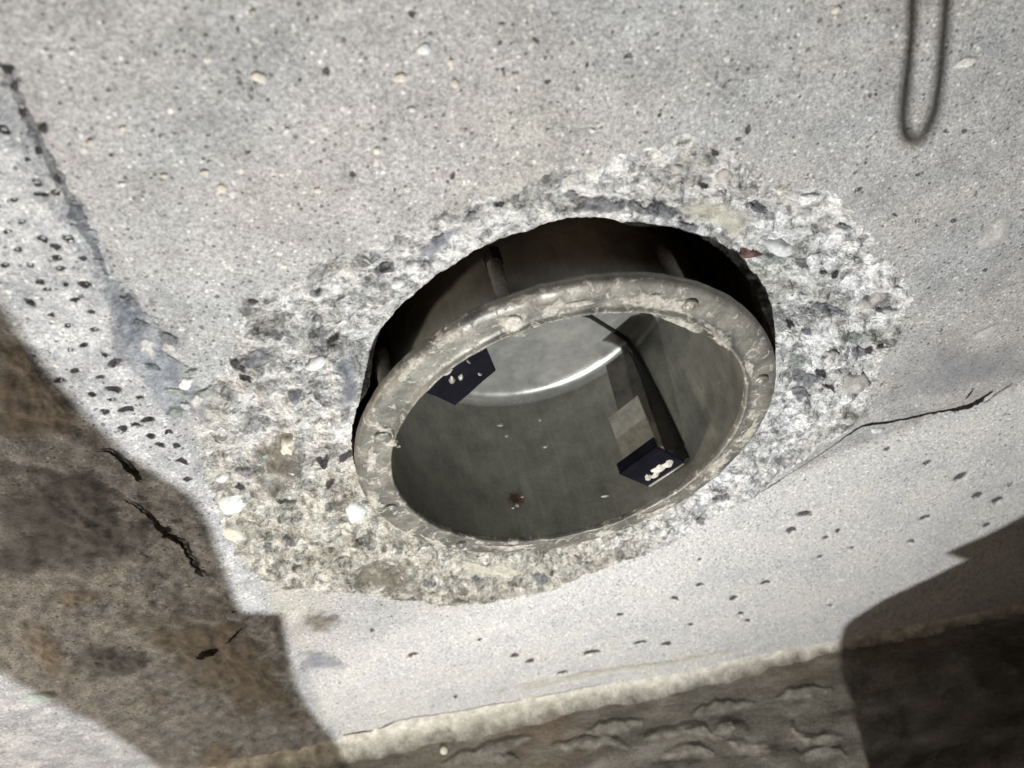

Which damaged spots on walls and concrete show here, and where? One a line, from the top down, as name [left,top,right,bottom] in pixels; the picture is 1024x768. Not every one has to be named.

spalling [250,71,268,82]
spalling [417,43,431,55]
spalling [88,125,914,607]
crack [757,385,1016,495]
crack [97,450,203,577]